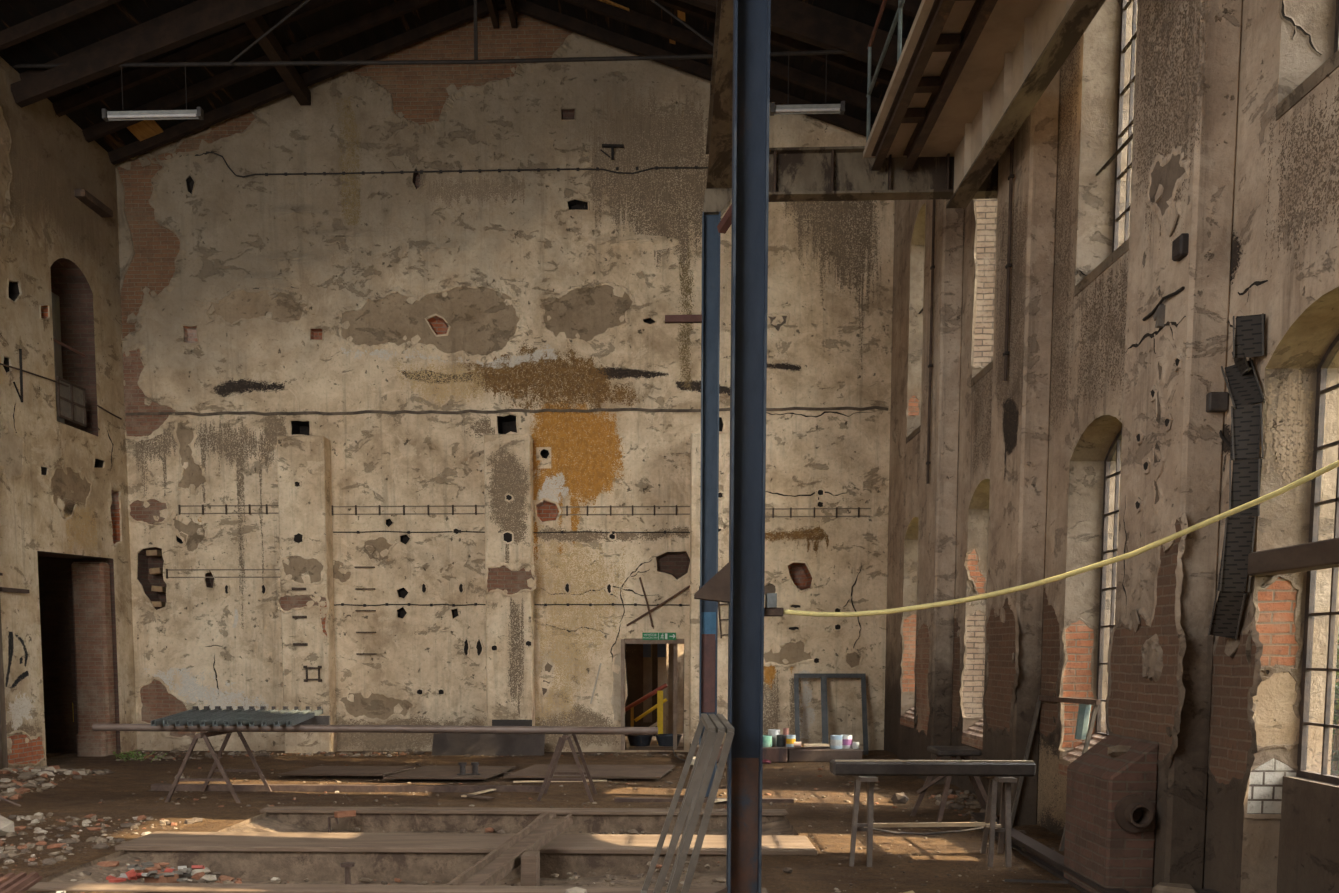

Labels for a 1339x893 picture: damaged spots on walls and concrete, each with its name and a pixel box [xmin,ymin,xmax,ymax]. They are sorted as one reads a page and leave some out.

flaking render [339,7,578,134]
crack [1279,0,1322,57]
leakage [567,71,709,270]
flaking render [39,109,261,618]
crack [1125,315,1186,355]
crack [1228,278,1268,330]
flaking render [7,730,46,768]
rust [395,339,648,727]
flaking render [900,611,932,742]
flaking render [951,546,1019,741]
flaking render [1039,353,1188,771]
flaking render [1208,574,1304,796]